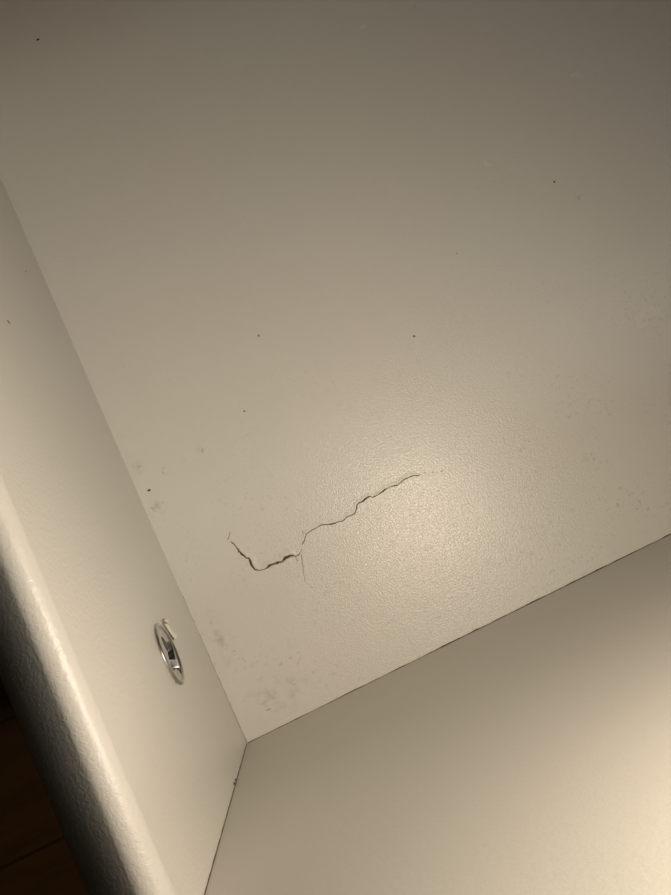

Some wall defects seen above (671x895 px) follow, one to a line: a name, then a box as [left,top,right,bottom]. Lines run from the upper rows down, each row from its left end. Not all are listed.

crack [227,471,443,580]
crack [183,534,670,895]